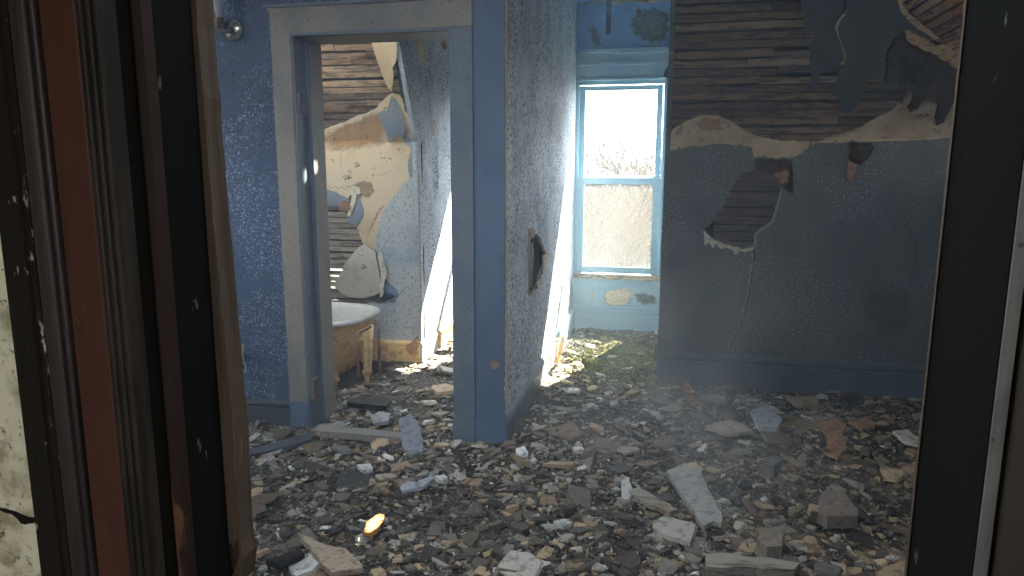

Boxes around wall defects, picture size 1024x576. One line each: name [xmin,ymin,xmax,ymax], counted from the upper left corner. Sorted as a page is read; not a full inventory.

flaking render [582,0,964,158]
peeling [321,44,413,304]
flaking render [703,170,782,255]
hole [527,228,549,294]
peeling [590,288,635,306]
crack [0,507,35,525]